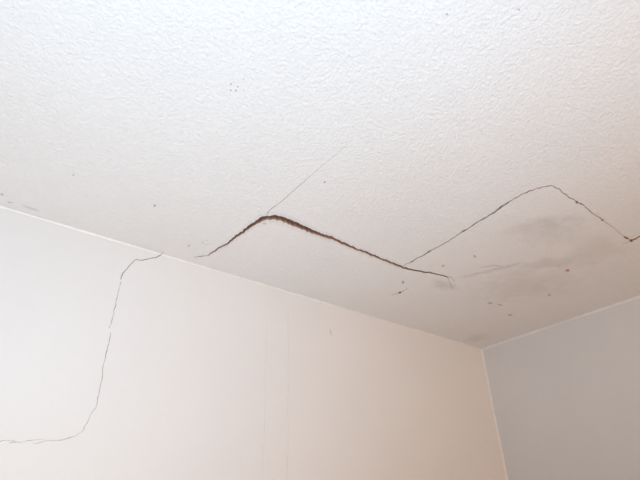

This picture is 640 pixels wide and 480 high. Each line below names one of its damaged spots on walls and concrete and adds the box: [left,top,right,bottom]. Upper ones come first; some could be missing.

crack [197,140,640,278]
crack [0,254,162,444]